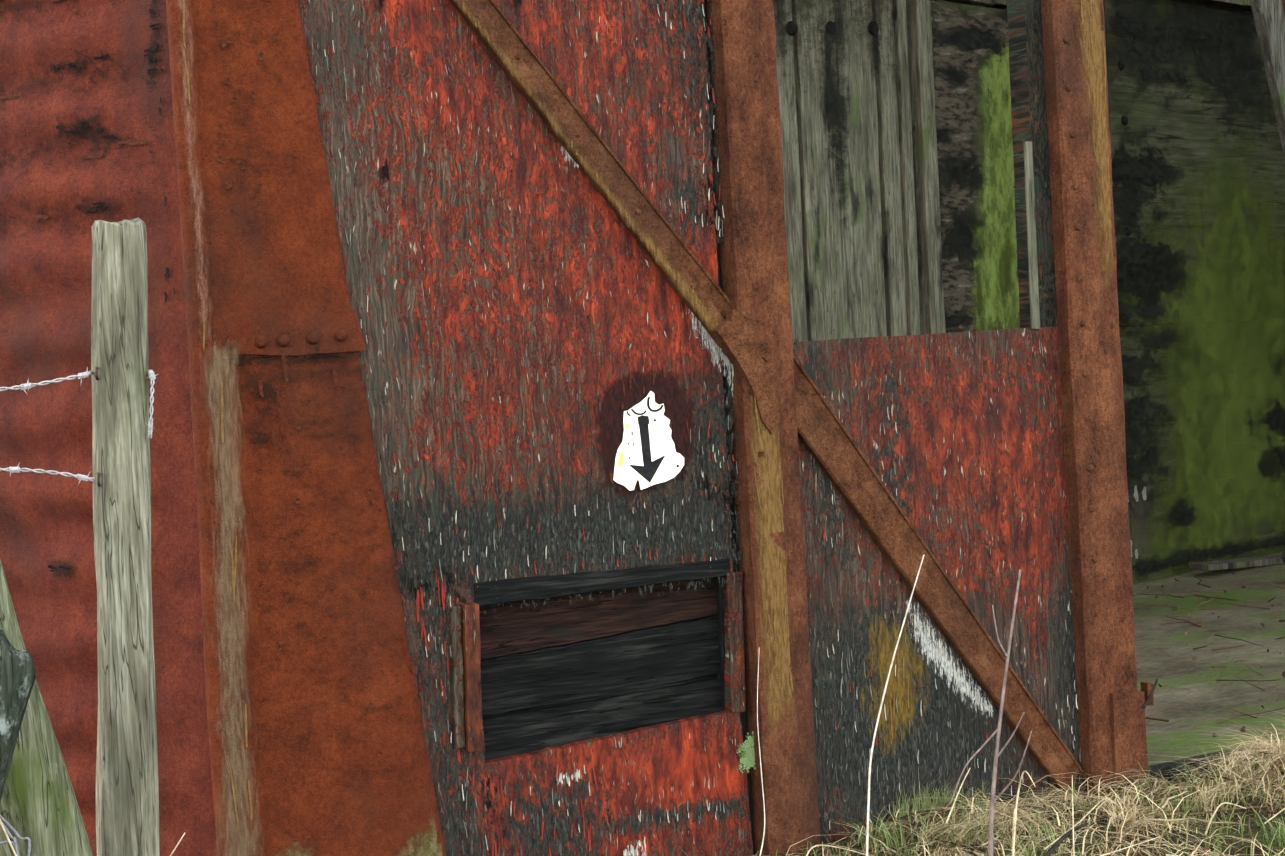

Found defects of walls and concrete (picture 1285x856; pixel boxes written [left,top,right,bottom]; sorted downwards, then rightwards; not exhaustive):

peeling [312,39,347,102]
leakage [776,0,895,224]
leakage [936,129,983,201]
leakage [932,12,1000,94]
corrosion [1080,0,1113,285]
leakage [940,208,982,291]
leakage [945,303,972,328]
leakage [1112,156,1206,526]
leakage [1249,401,1285,479]
peeling [386,304,749,856]
corrosion [751,396,794,726]
corrosion [872,624,920,742]